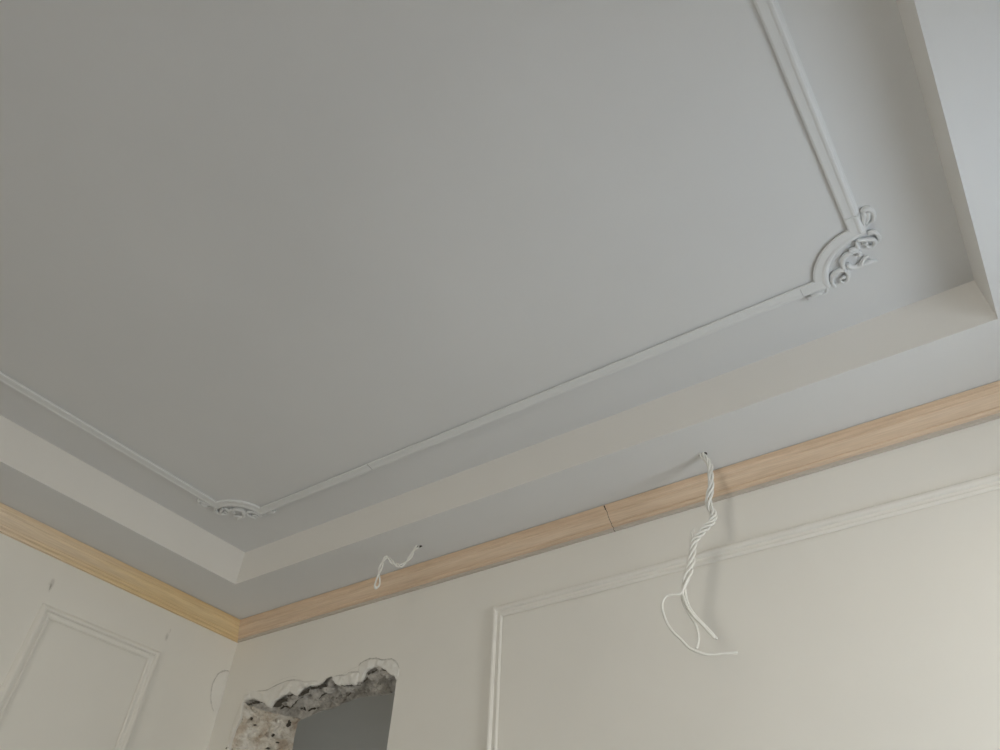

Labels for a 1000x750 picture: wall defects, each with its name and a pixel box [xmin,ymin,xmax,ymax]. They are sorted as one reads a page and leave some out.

spalling [231,666,396,750]